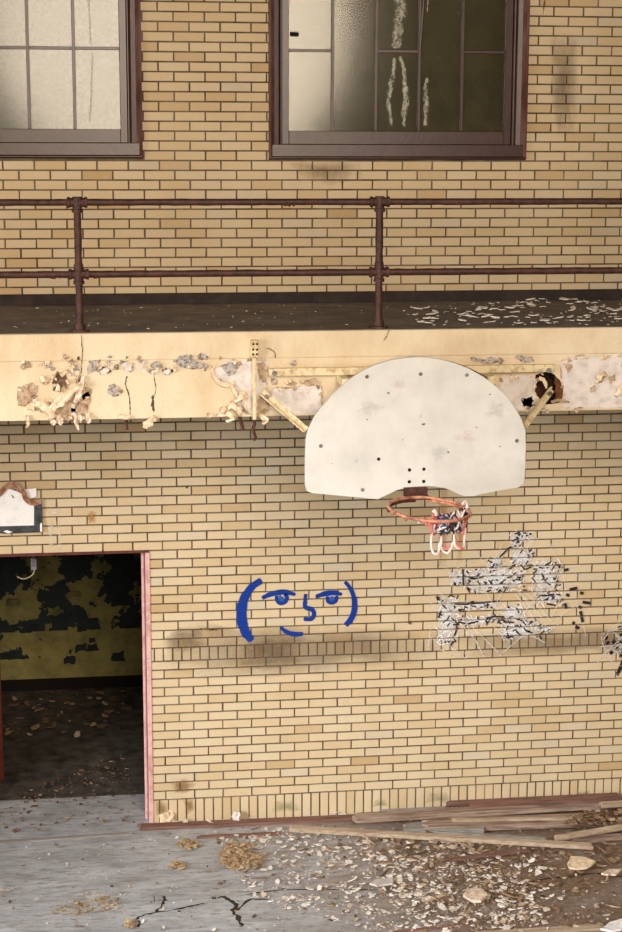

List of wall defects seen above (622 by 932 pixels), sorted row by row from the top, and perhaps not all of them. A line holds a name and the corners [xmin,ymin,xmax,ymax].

peeling [17,353,323,431]
peeling [470,356,505,364]
peeling [489,352,622,414]
crack [136,889,373,927]